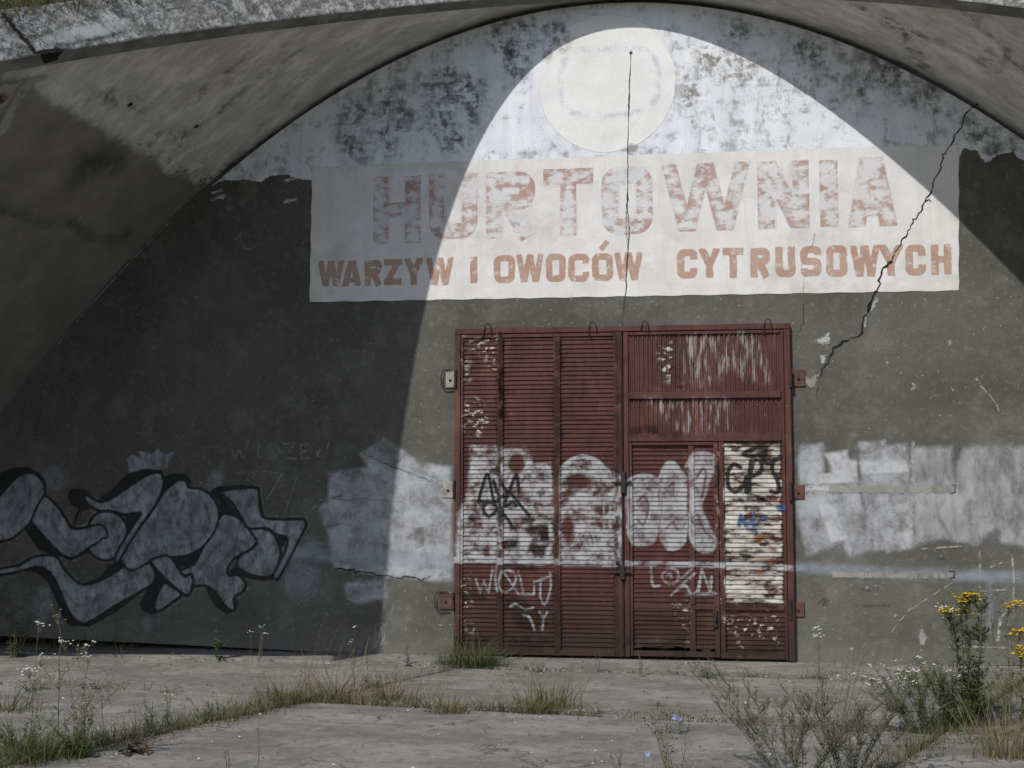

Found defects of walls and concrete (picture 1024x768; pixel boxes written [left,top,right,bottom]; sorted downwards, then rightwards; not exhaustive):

leakage [492,23,527,77]
leakage [697,50,755,80]
leakage [431,67,478,123]
crack [622,51,632,323]
crack [816,103,978,395]
crack [334,567,430,581]